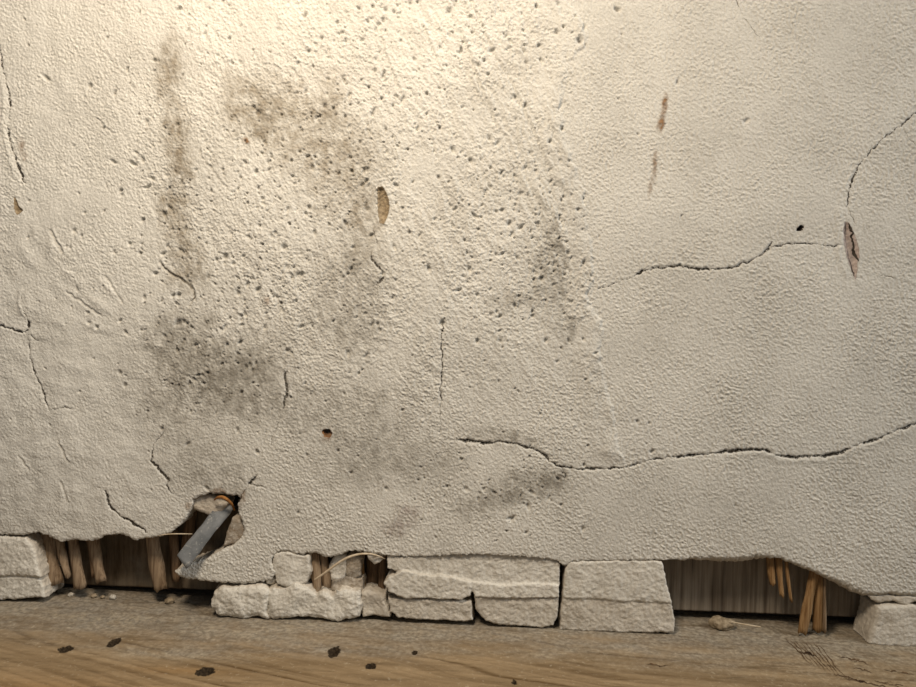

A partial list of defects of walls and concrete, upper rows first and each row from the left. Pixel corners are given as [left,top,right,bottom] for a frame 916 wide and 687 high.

crack [0,50,25,183]
crack [846,112,916,224]
crack [598,241,838,289]
flaking render [837,222,860,279]
crack [439,322,914,477]
crack [144,410,191,502]
crack [104,490,146,533]